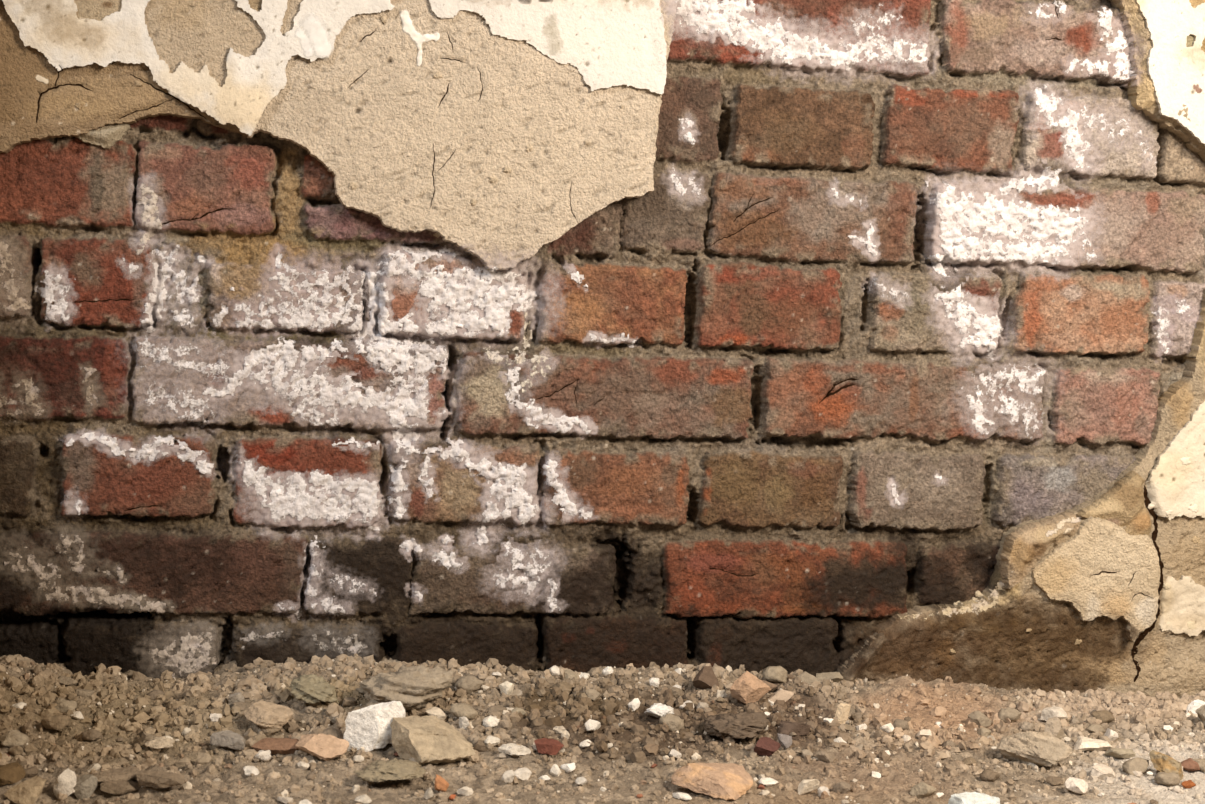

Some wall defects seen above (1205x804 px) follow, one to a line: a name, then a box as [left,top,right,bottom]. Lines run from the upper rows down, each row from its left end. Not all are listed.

spalling [0,0,662,270]
spalling [659,0,679,62]
spalling [1110,0,1205,161]
water stain [0,176,1136,693]
spalling [854,289,1205,699]
crack [1091,485,1164,682]